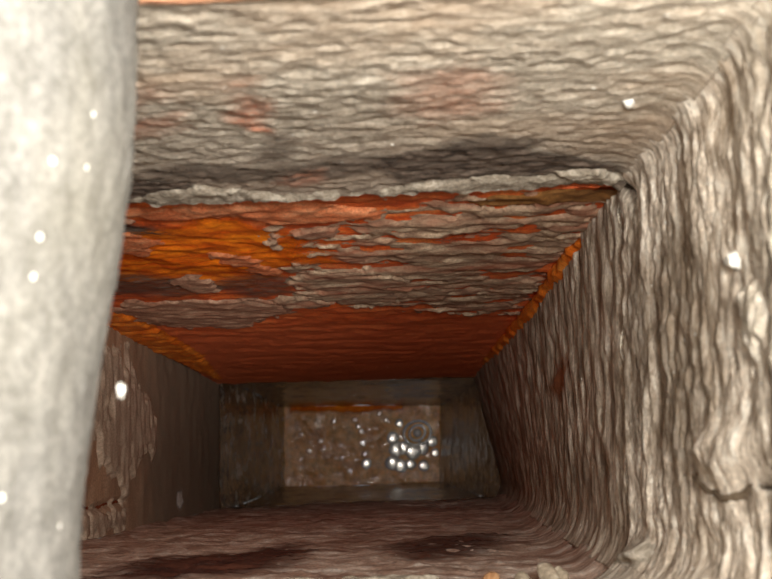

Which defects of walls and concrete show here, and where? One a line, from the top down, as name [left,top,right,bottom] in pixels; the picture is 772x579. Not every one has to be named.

crack [764,106,772,152]
spalling [121,168,624,258]
peeling [112,274,297,330]
corrosion [118,218,331,287]
peeling [206,252,284,276]
spalling [479,238,582,370]
crack [764,193,772,379]
corrosion [552,362,567,397]
peeling [81,340,157,540]
water stain [394,533,500,559]